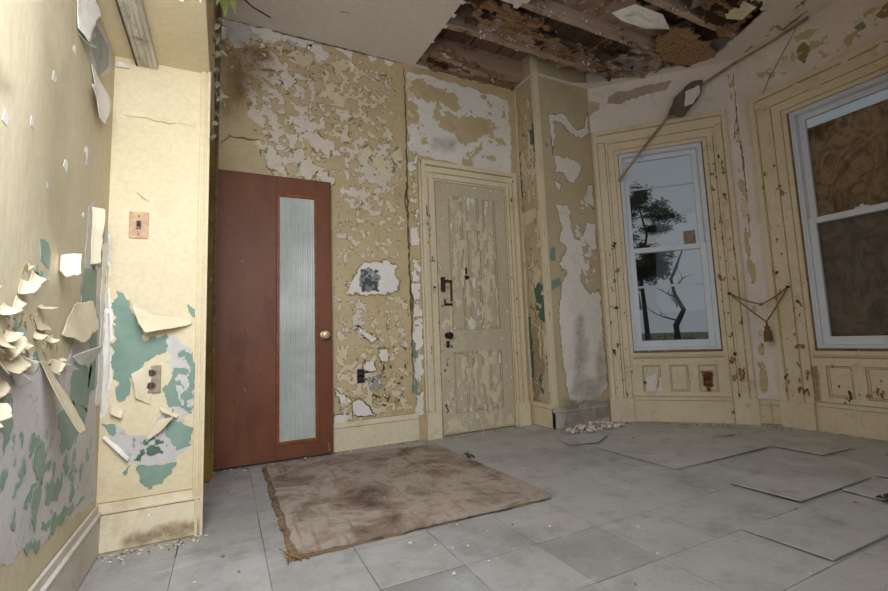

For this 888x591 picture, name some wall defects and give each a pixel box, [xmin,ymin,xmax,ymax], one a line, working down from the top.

peeling [73,0,130,124]
peeling [459,0,495,27]
peeling [696,0,770,46]
peeling [756,1,888,81]
peeling [221,20,674,433]
peeling [0,200,195,567]